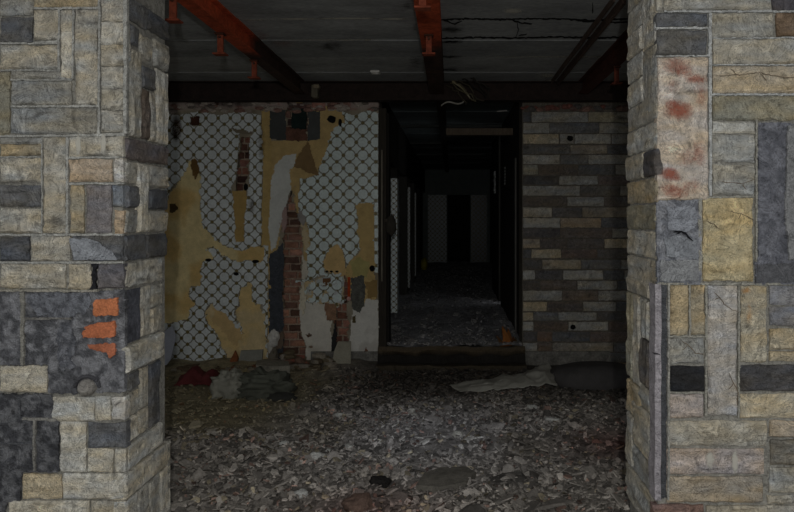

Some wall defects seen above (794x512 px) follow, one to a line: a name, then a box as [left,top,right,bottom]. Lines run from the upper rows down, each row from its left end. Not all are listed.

crack [441,3,628,42]
corrosion [670,102,688,117]
peeling [165,102,380,360]